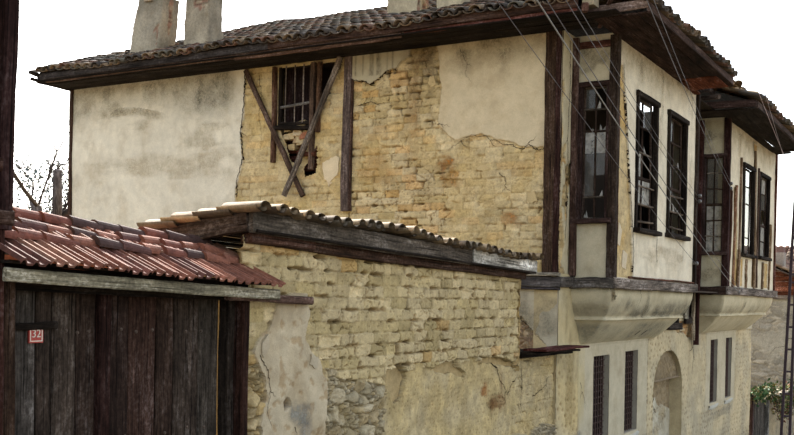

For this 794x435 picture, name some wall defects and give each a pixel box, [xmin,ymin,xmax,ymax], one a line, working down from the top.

crack [235,74,266,197]
spalling [283,120,340,186]
peeling [348,46,550,277]
crack [437,123,544,150]
crack [491,363,548,409]
peeling [652,399,670,435]